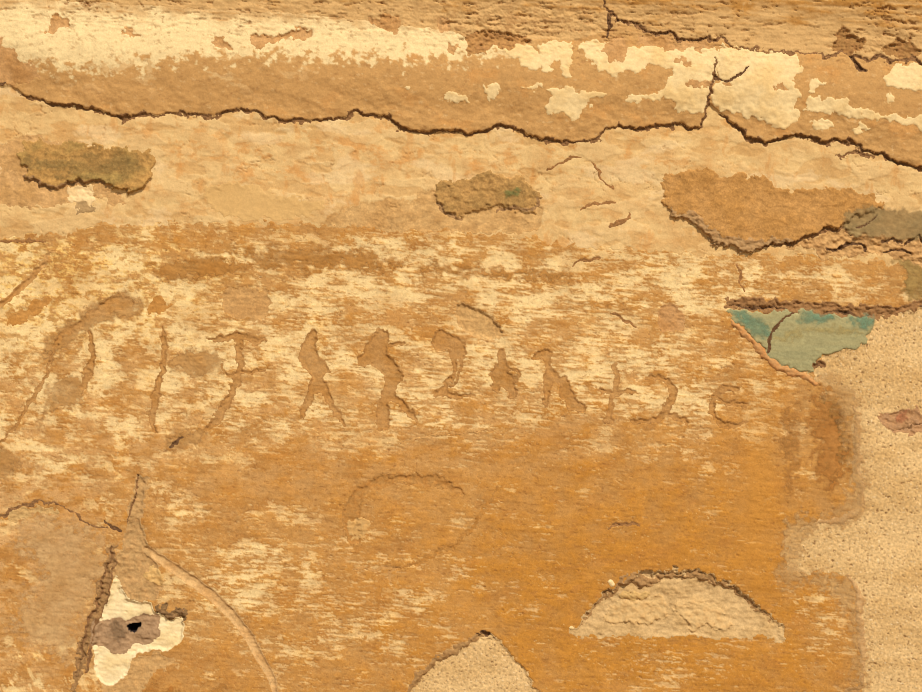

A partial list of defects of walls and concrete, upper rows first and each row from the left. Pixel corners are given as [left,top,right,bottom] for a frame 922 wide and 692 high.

peeling [0,37,41,86]
peeling [44,13,70,34]
peeling [211,36,233,50]
peeling [250,26,313,50]
peeling [368,13,401,35]
peeling [437,15,922,135]
crack [0,0,922,228]
peeling [147,295,173,315]
crack [0,474,139,692]
spalling [569,565,786,643]
spalling [407,633,485,692]